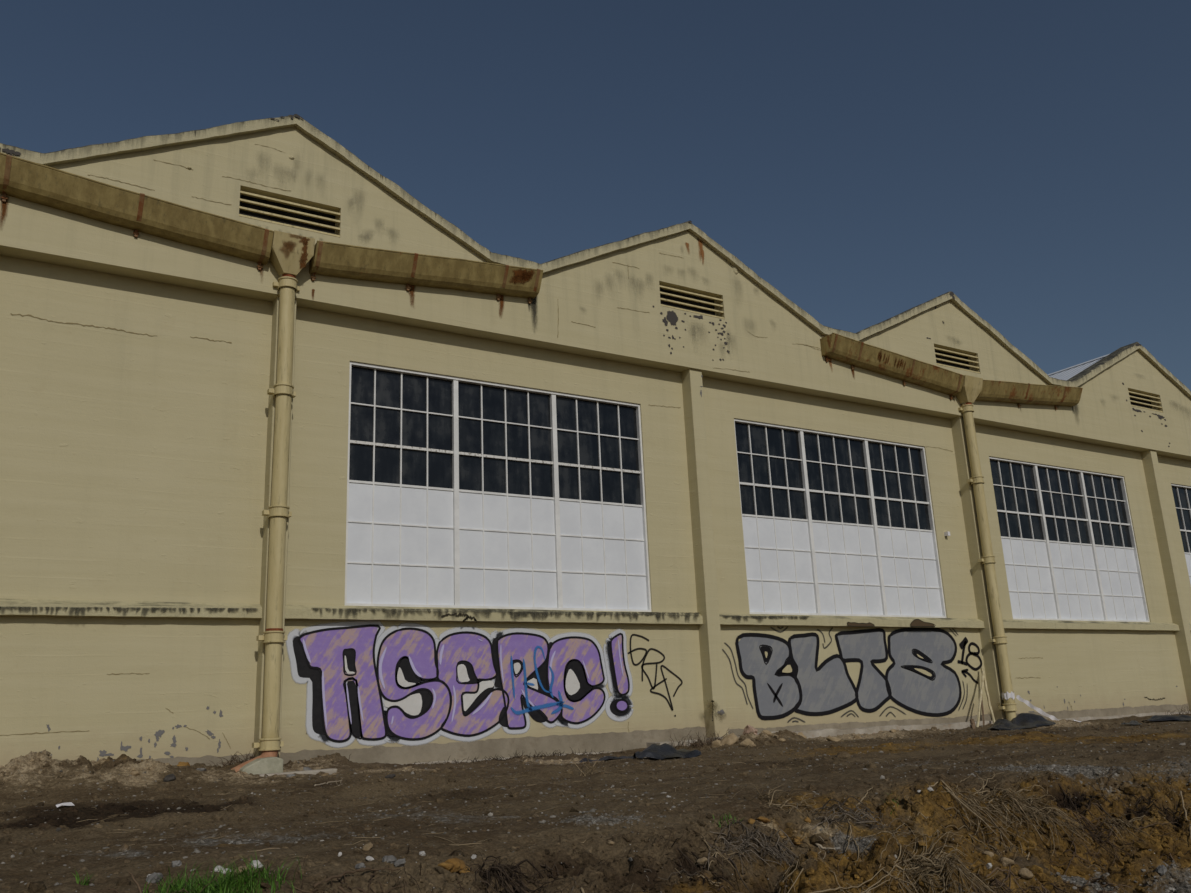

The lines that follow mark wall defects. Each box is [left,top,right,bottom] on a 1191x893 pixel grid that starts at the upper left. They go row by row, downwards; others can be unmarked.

corrosion [281,237,310,278]
corrosion [510,269,534,283]
crack [11,313,155,336]
peeling [653,306,730,361]
peeling [97,724,188,761]